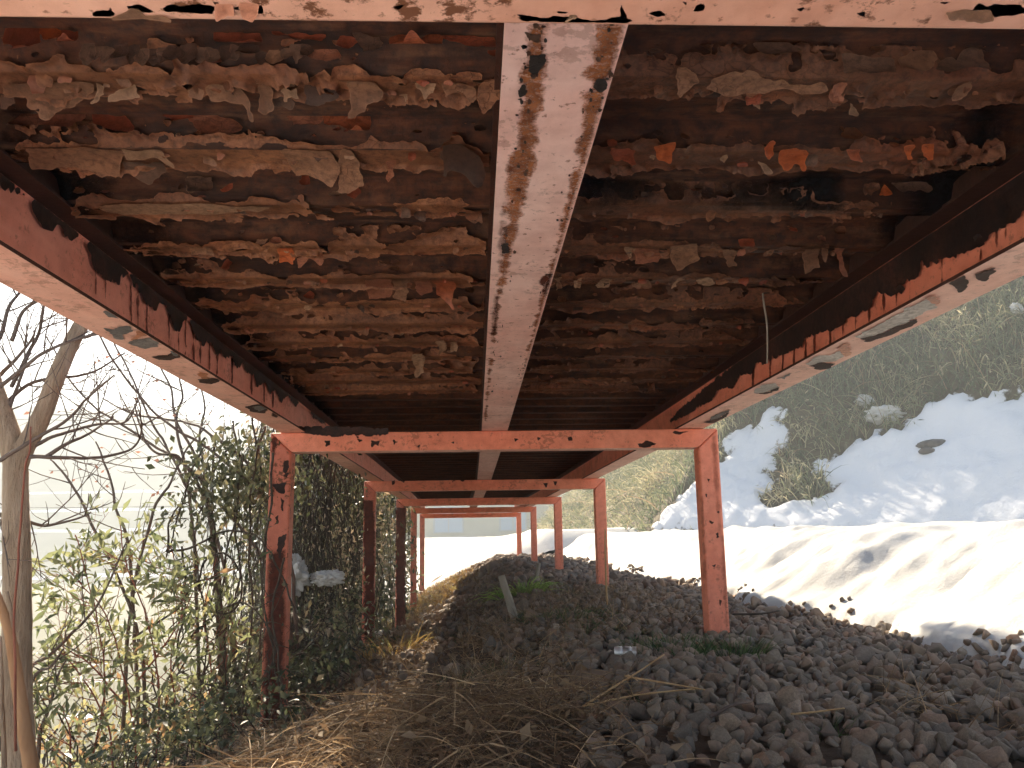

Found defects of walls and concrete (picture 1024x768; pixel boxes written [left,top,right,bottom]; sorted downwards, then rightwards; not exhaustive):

peeling [517,7,631,24]
peeling [941,2,1024,23]
peeling [0,2,501,418]
rust [484,23,547,421]
rust [518,24,622,375]
peeling [519,41,1024,435]
rust [168,313,233,384]
rust [271,437,289,523]
peeling [299,410,397,447]
rust [262,534,287,728]
rust [362,500,376,641]
rust [395,507,407,626]